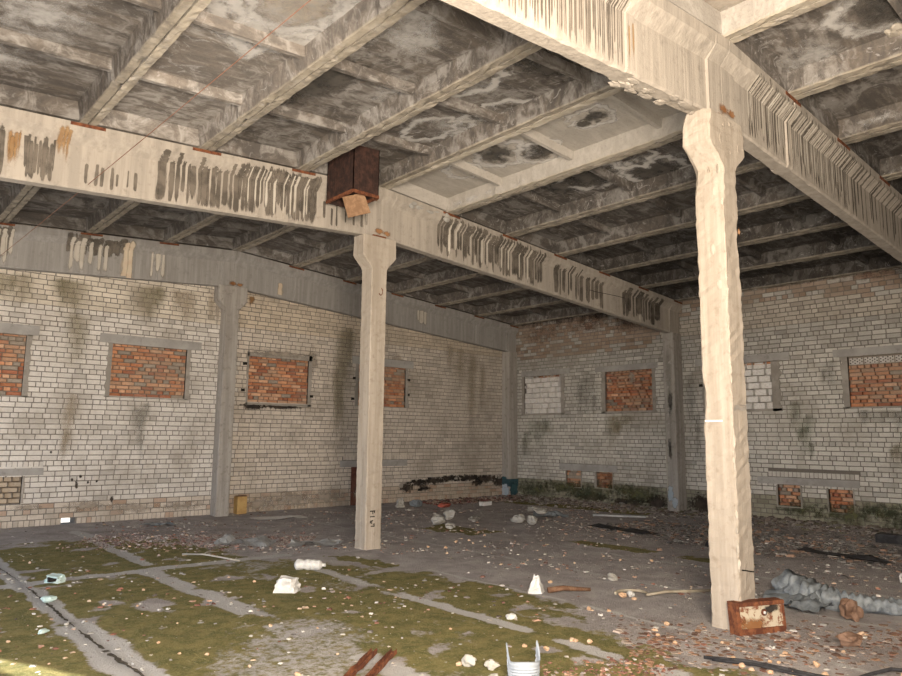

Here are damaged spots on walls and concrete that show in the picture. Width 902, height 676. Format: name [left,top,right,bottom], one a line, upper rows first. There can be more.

water stain [207,0,362,46]
water stain [216,32,275,59]
water stain [451,70,512,98]
water stain [399,114,486,142]
water stain [481,98,532,108]
water stain [565,104,617,129]
water stain [441,139,563,179]
water stain [544,150,691,197]